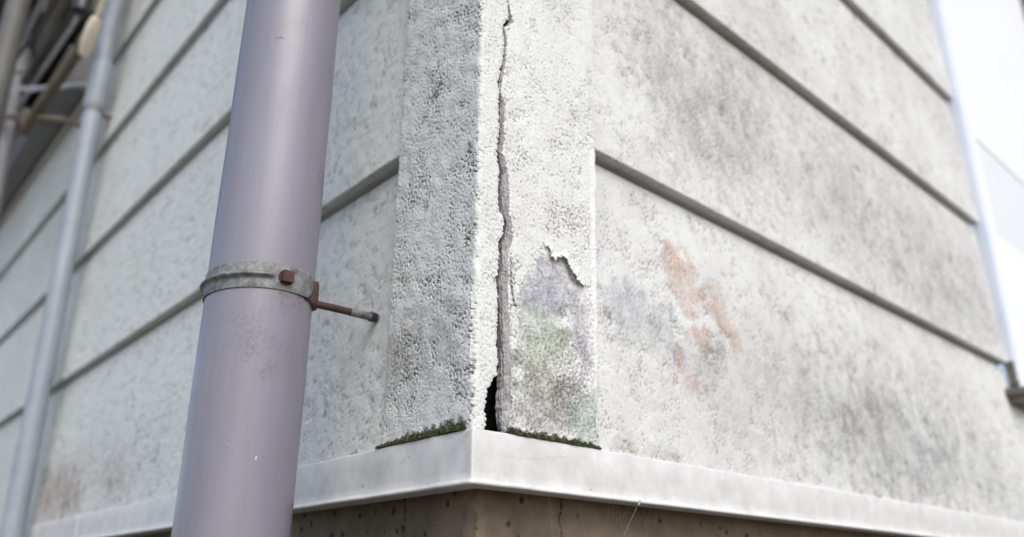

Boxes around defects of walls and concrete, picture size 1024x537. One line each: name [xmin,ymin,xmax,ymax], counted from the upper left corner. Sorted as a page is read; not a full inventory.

crack [484,1,514,433]
peeling [507,242,599,445]